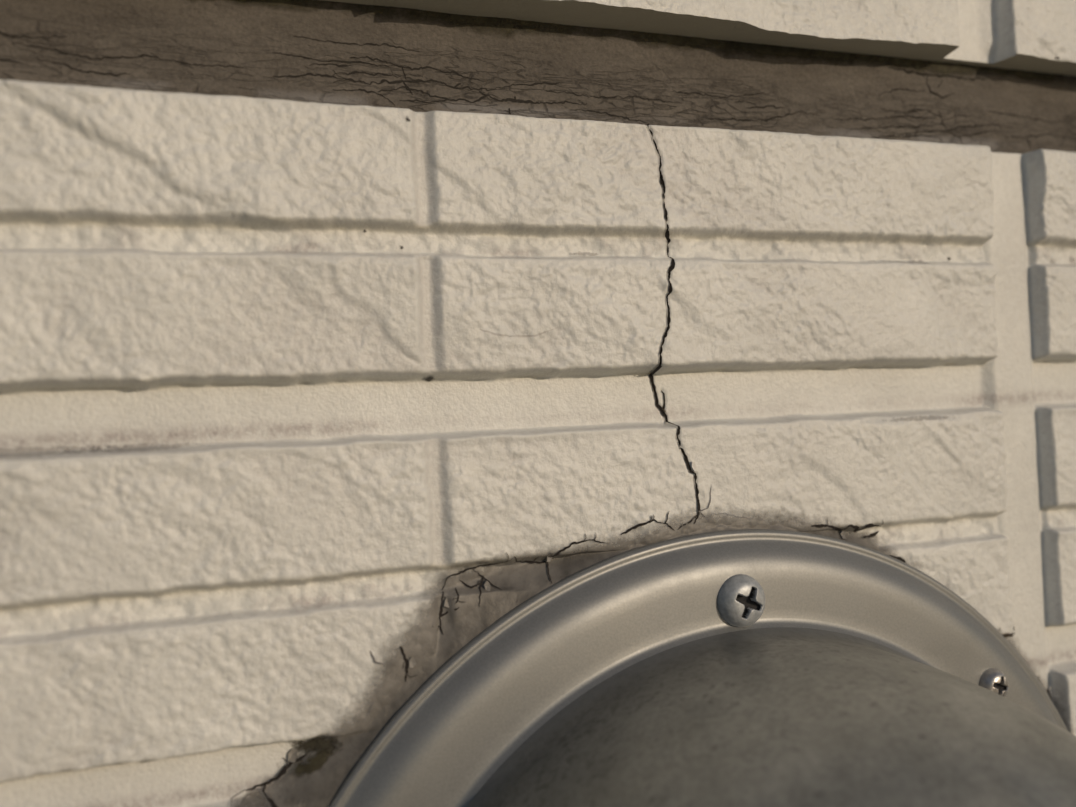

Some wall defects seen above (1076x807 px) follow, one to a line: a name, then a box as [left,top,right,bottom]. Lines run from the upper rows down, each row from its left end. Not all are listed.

crack [0,32,245,76]
crack [272,36,1076,635]
crack [369,646,417,682]
crack [246,749,311,807]